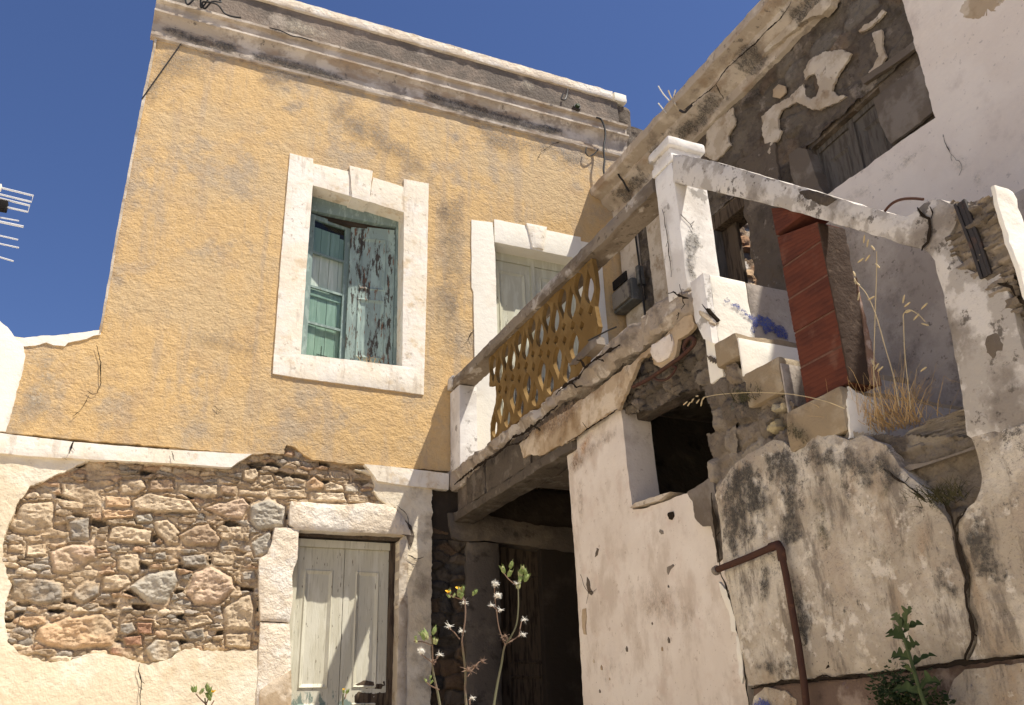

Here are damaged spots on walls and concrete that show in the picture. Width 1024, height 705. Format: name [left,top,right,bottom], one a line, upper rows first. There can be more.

water stain [427,92,557,146]
crack [684,3,791,110]
flaking render [697,0,914,206]
spalling [960,0,1004,19]
flaking render [707,190,734,216]
flaking render [638,227,655,312]
crack [73,345,101,416]
crack [454,344,620,485]
spalling [2,447,383,665]
water stain [722,453,801,557]
water stain [809,445,898,491]
crack [711,468,1023,705]